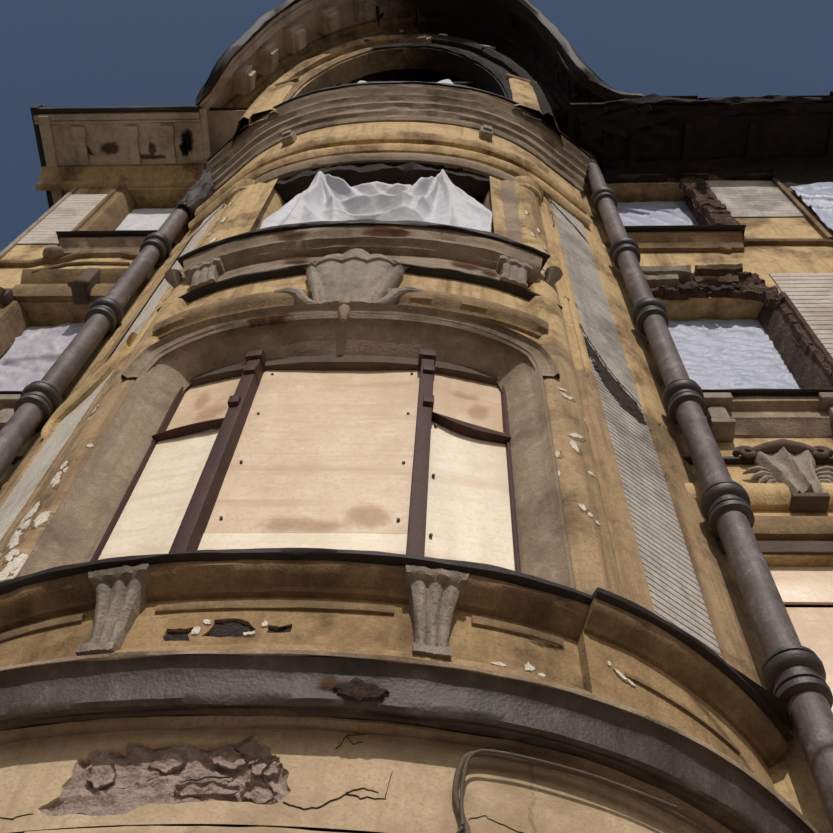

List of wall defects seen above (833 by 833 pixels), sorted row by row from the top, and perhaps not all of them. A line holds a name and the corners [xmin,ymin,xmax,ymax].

spalling [679,177,740,225]
spalling [641,263,833,387]
peeling [51,459,71,490]
peeling [0,501,55,583]
peeling [164,619,292,641]
rust [318,676,390,702]
crack [335,734,367,749]
spalling [40,735,290,817]
crack [283,773,392,810]